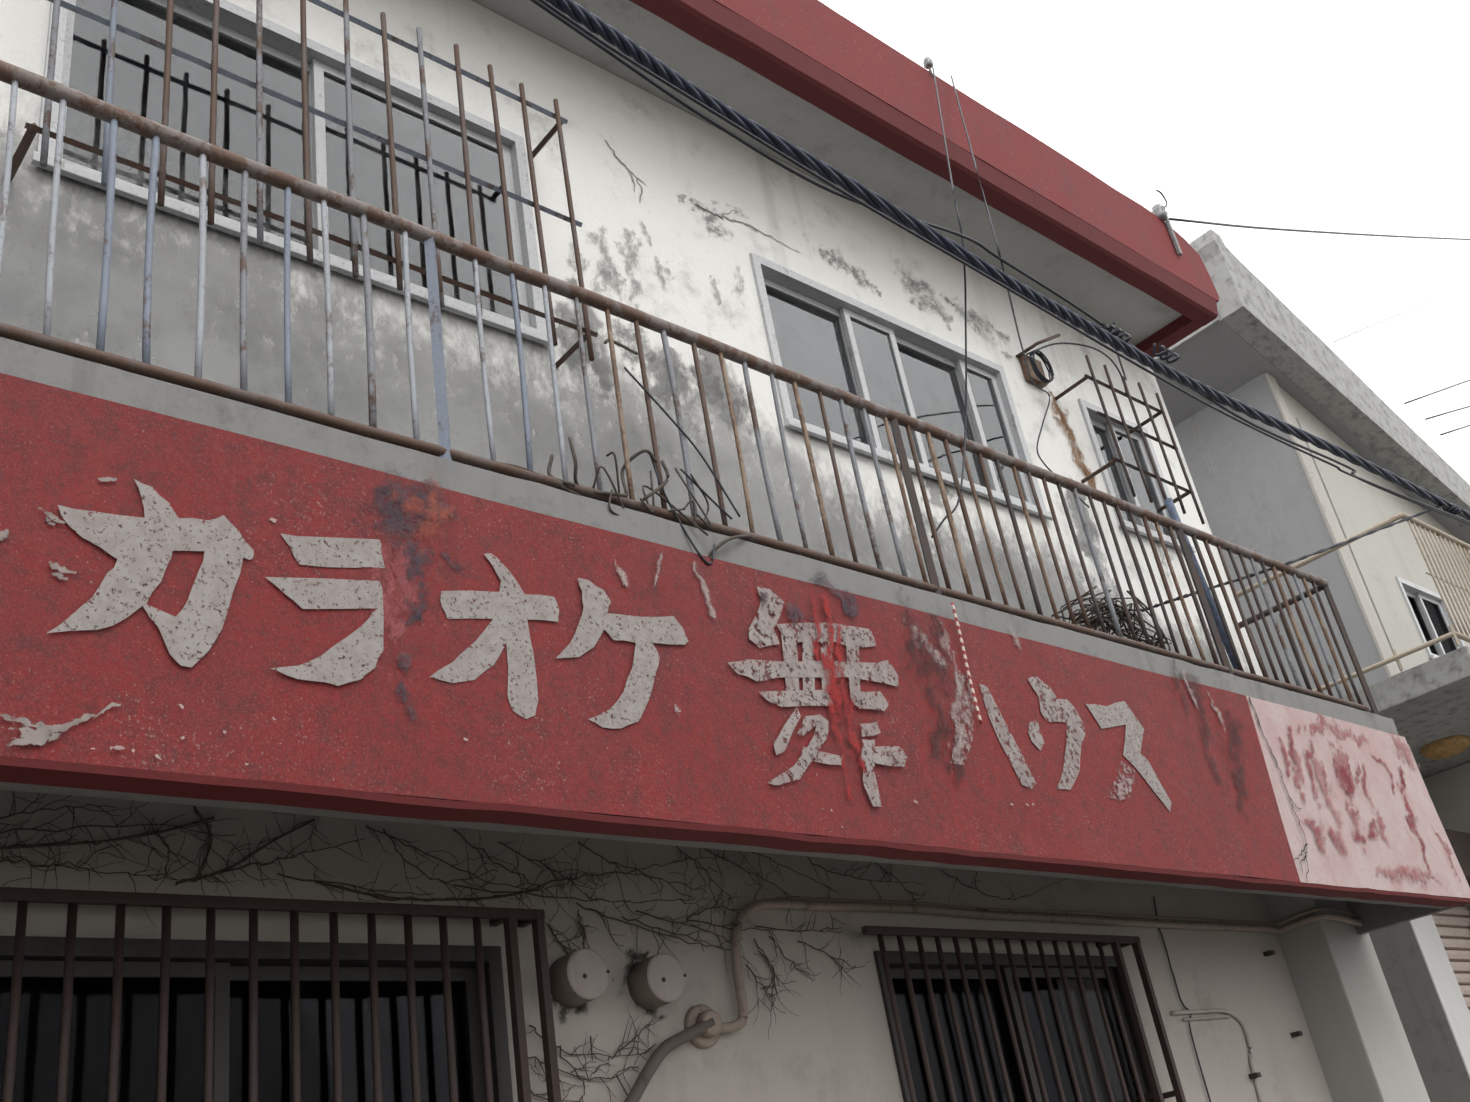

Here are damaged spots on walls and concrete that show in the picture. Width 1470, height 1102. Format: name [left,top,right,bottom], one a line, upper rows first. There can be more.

crack [605,140,646,203]
crack [695,204,799,252]
corrosion [1049,391,1096,489]